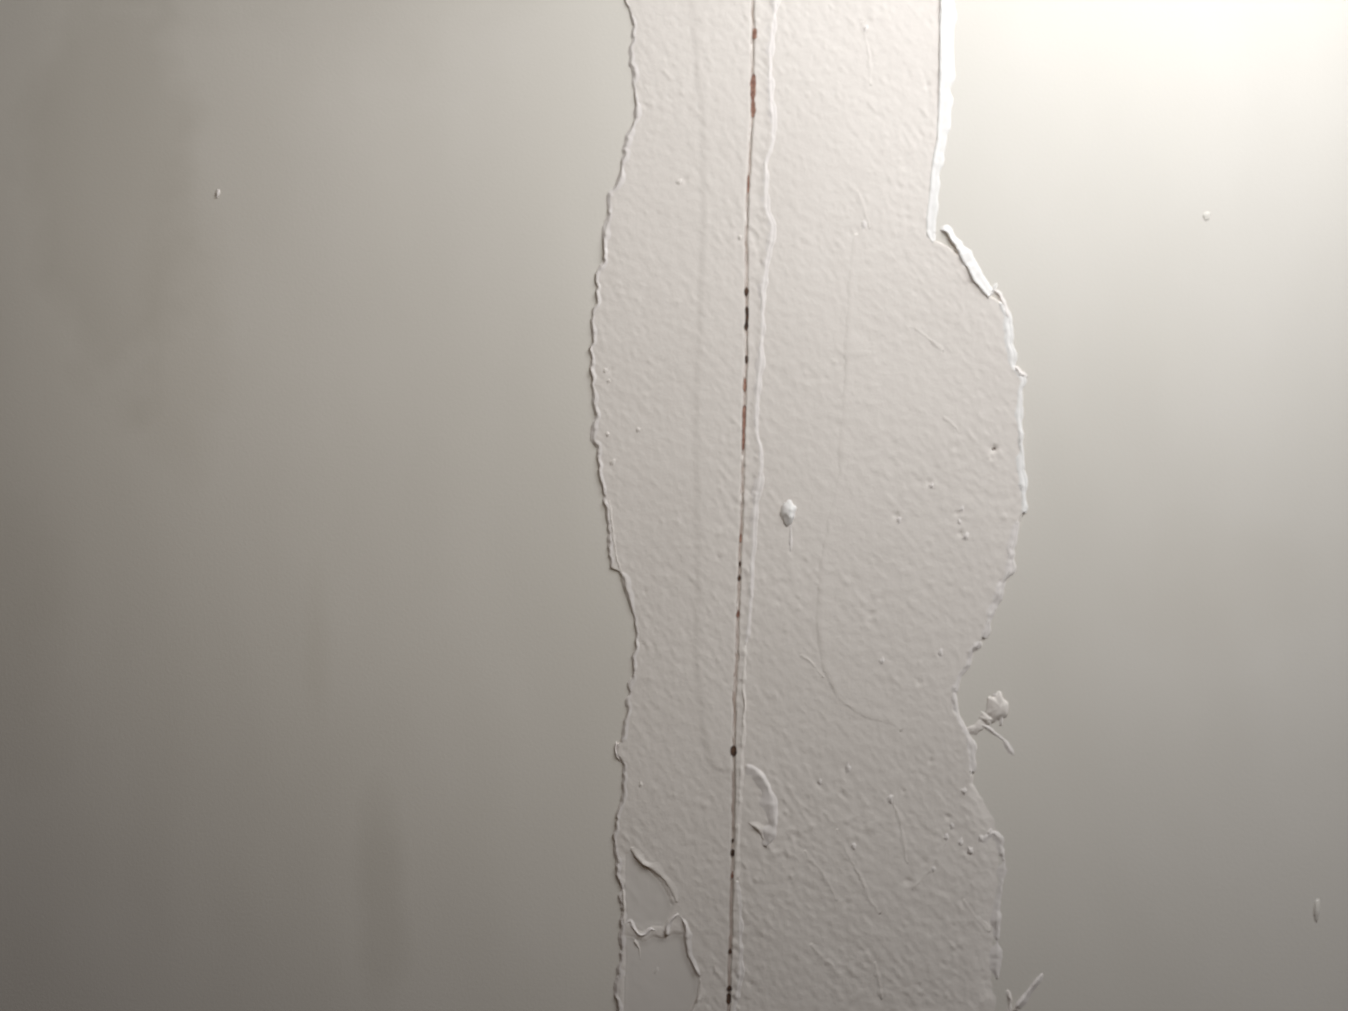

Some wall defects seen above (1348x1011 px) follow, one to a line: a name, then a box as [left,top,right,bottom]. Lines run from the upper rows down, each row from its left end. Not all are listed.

peeling [926,0,1009,318]
crack [727,0,754,1011]
peeling [745,764,778,848]
peeling [951,691,1014,773]